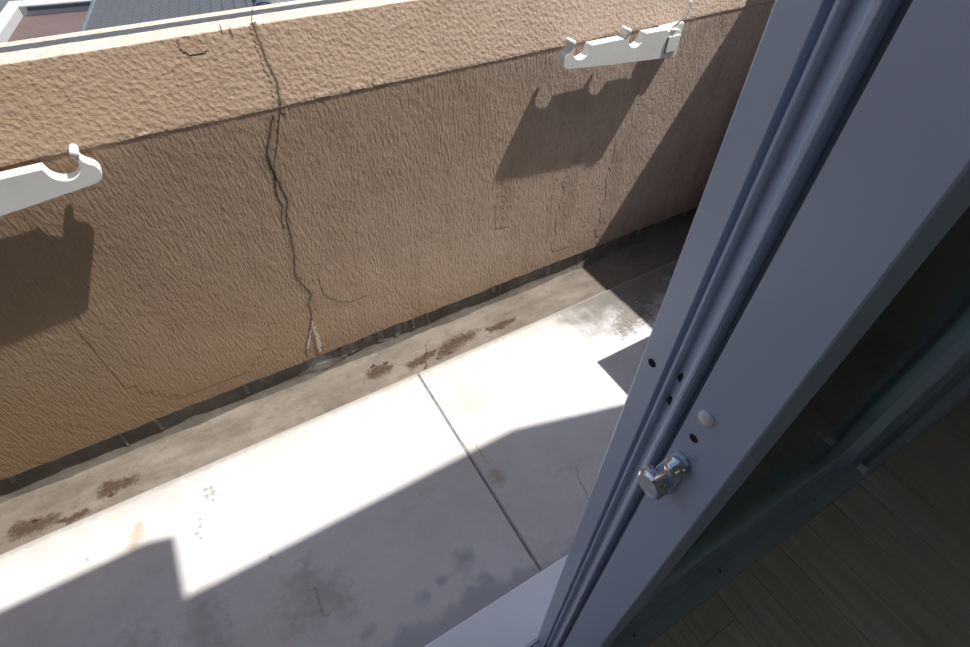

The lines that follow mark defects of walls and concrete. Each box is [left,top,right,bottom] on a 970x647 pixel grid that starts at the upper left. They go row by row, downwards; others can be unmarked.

crack [219,7,323,358]